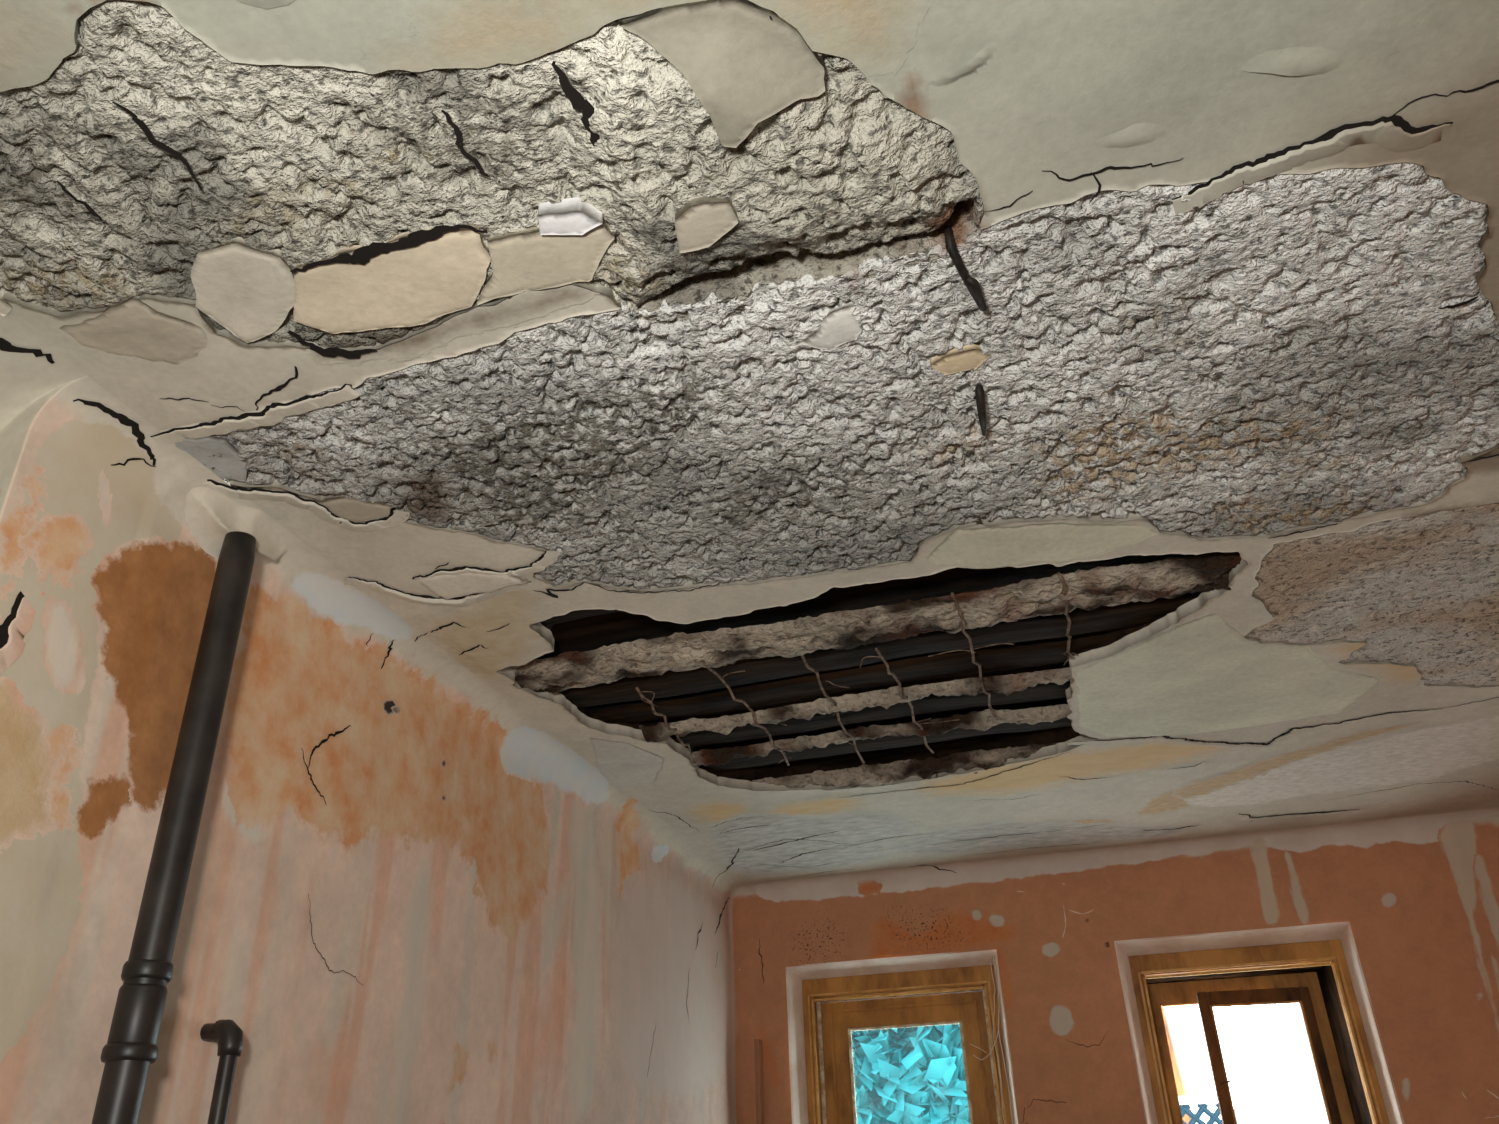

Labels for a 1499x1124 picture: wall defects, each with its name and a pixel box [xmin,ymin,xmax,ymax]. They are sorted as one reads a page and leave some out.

crack [985,80,1499,216]
crack [0,338,55,364]
crack [73,330,377,467]
spalling [0,0,1499,788]
crack [203,479,410,532]
crack [0,591,36,674]
leakage [17,512,218,814]
leakage [417,576,551,688]
crack [344,550,736,669]
leakage [212,922,253,1028]
leakage [1249,837,1310,926]
leakage [1437,818,1499,1042]